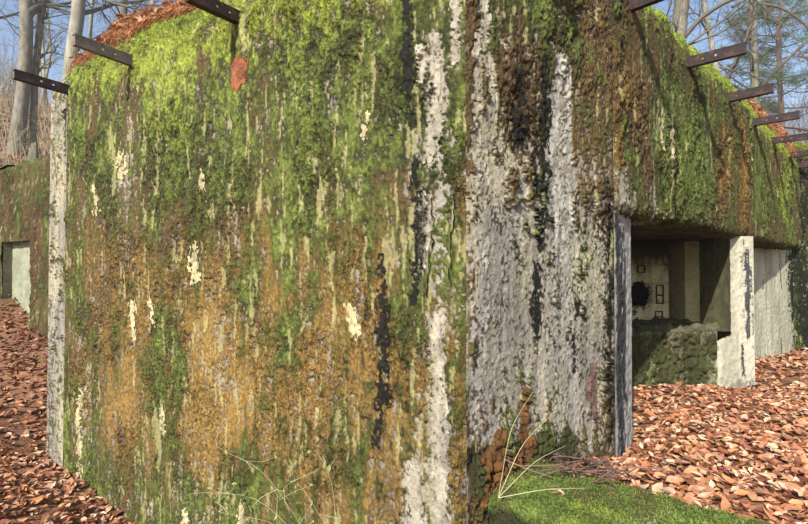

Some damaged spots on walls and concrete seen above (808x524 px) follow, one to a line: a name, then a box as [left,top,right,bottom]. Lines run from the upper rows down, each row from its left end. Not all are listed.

corrosion [230,54,249,93]
water stain [507,49,581,373]
water stain [479,236,492,390]
water stain [606,204,628,456]
water stain [730,240,755,389]